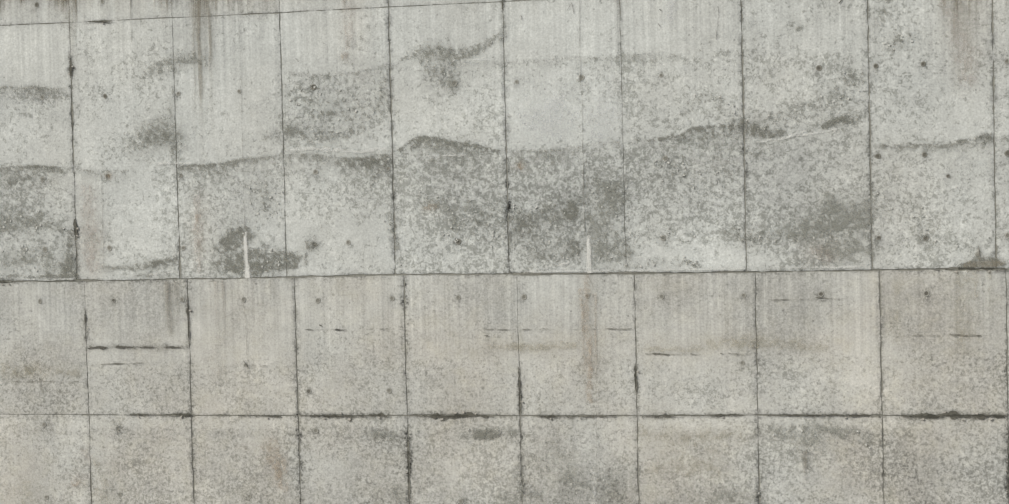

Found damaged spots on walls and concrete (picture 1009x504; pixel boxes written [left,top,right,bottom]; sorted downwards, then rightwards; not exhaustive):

leakage [128,108,274,176]
leakage [212,226,318,278]